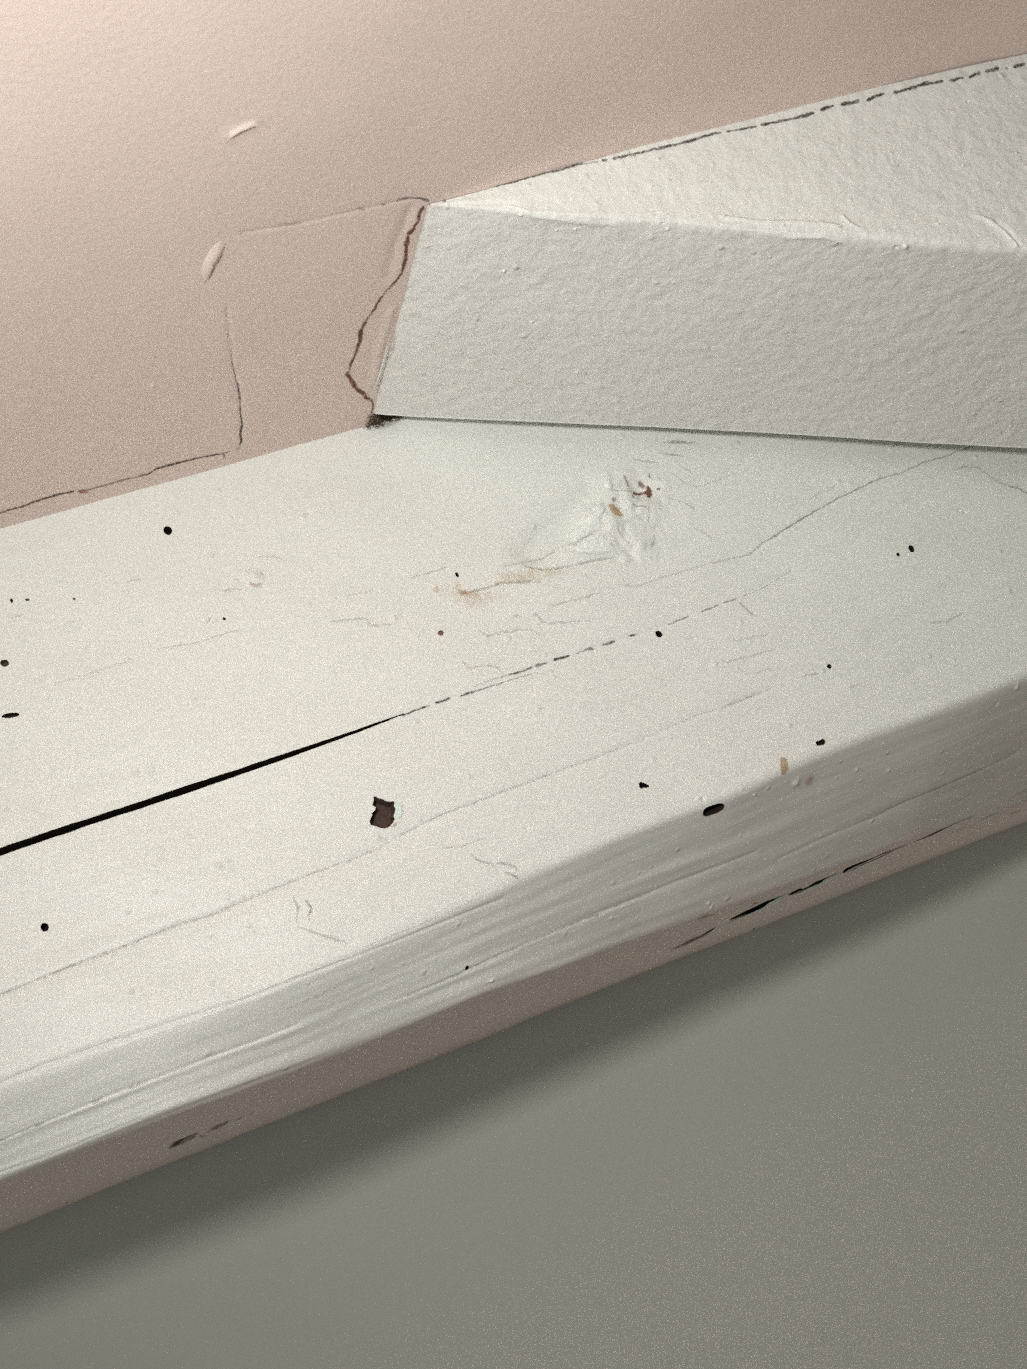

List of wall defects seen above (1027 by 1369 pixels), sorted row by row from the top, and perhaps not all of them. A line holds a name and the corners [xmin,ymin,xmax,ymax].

crack [495,63,1025,187]
crack [345,198,445,413]
crack [402,634,635,716]
spalling [370,796,402,829]
spalling [677,824,954,948]